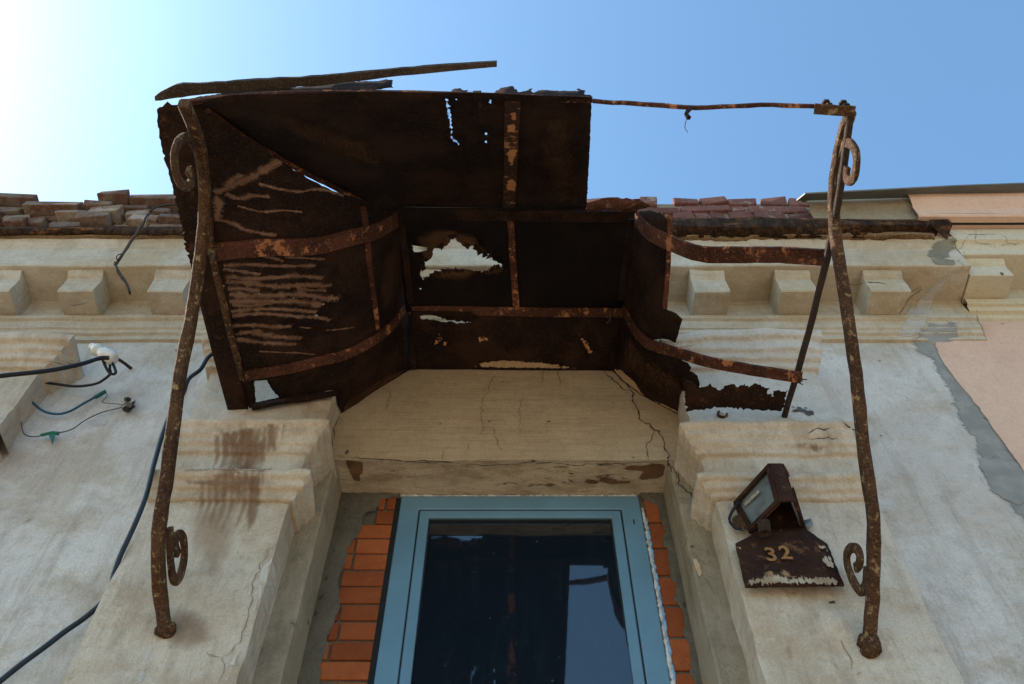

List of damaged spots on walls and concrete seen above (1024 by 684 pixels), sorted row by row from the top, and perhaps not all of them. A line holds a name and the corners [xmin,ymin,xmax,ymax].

corrosion [212,159,345,237]
corrosion [223,256,353,355]
corrosion [420,231,499,281]
corrosion [194,425,274,525]
corrosion [343,368,404,412]
crack [331,370,693,497]